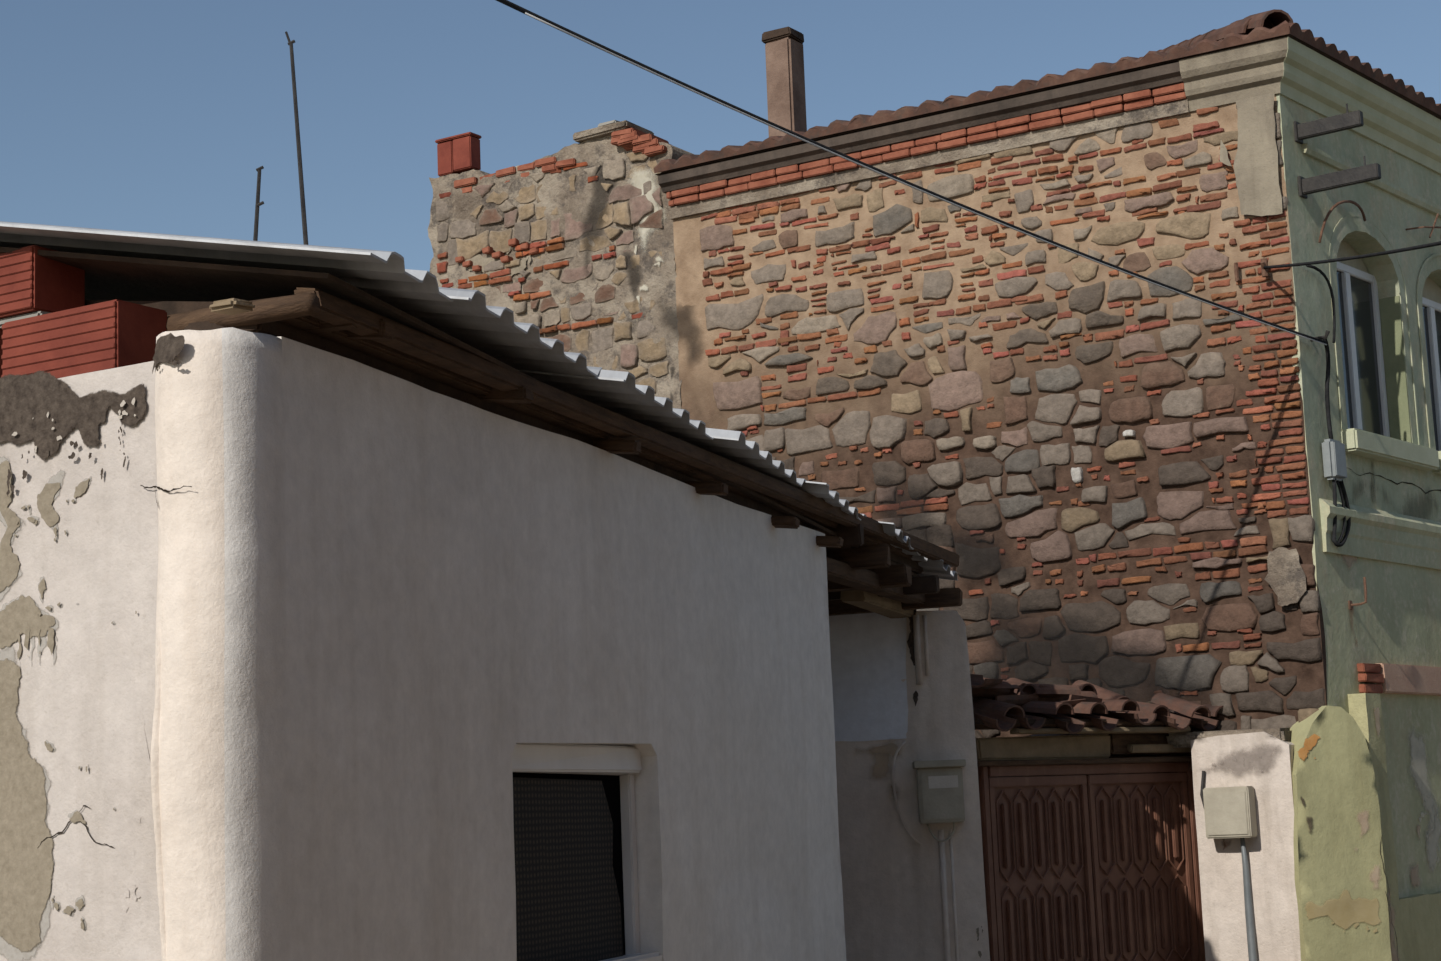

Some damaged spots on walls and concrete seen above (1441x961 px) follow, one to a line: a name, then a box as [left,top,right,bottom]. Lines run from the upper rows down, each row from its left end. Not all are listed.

crack [1349,468,1441,494]
peeling [0,333,185,961]
crack [38,805,114,848]